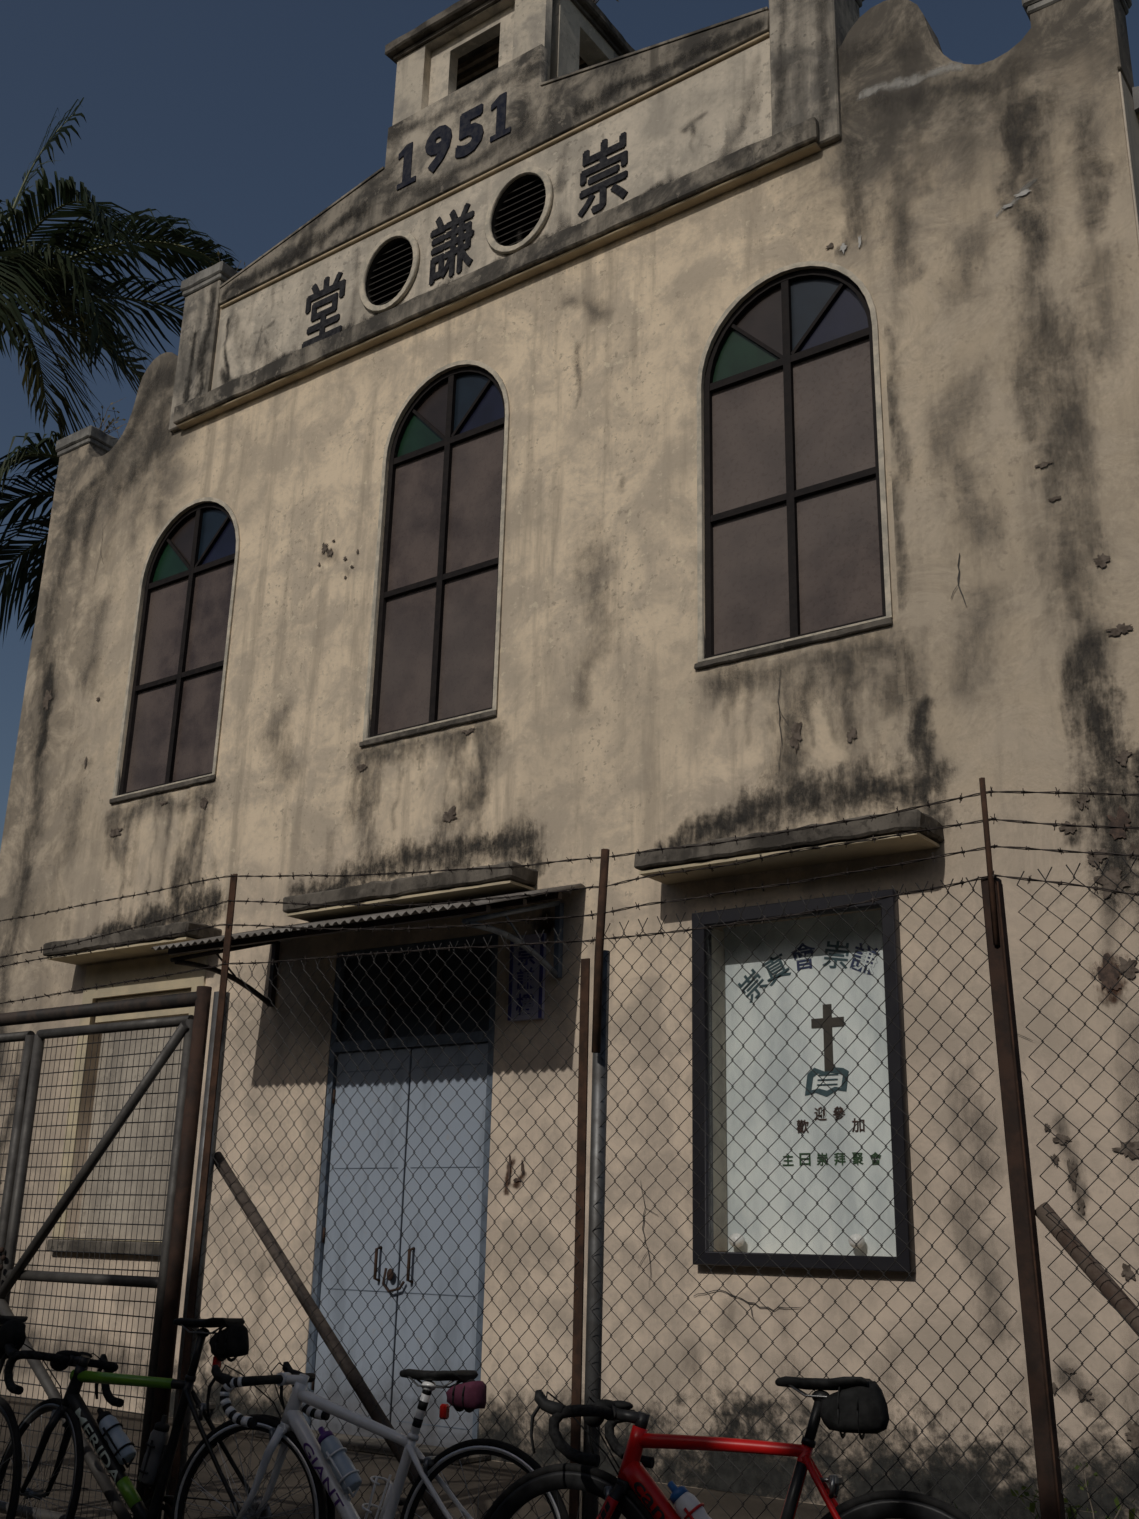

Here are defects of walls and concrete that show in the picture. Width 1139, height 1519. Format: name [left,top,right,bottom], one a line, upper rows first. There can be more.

water stain [1026,288,1082,502]
water stain [1060,530,1133,666]
water stain [35,640,53,771]
water stain [92,790,227,935]
water stain [291,724,542,896]
water stain [658,679,950,848]
water stain [818,641,898,743]
water stain [477,1396,1041,1519]
water stain [1059,1421,1139,1519]